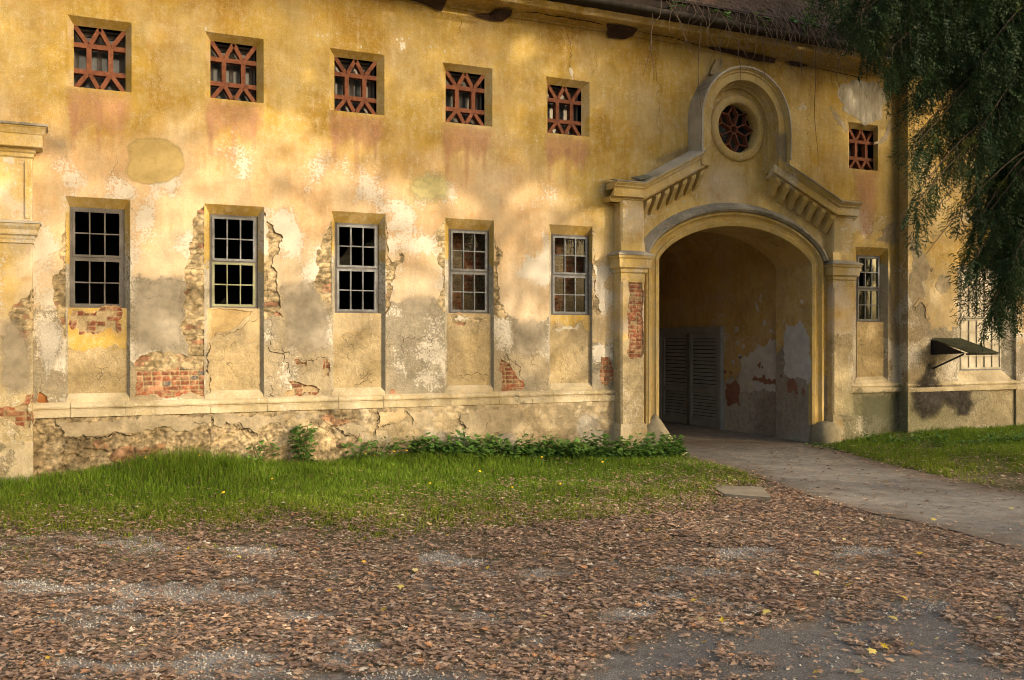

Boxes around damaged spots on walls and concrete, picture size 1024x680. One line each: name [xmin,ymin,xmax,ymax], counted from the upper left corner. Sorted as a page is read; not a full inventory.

peeling [830,79,891,145]
flaking render [52,206,332,399]
flaking render [627,280,645,359]
crack [268,342,327,396]
flaking render [499,358,525,391]
flaking render [600,357,613,387]
flaking render [724,294,811,406]
flaking render [55,413,287,437]
flaking render [338,409,434,435]
leakage [961,391,971,415]